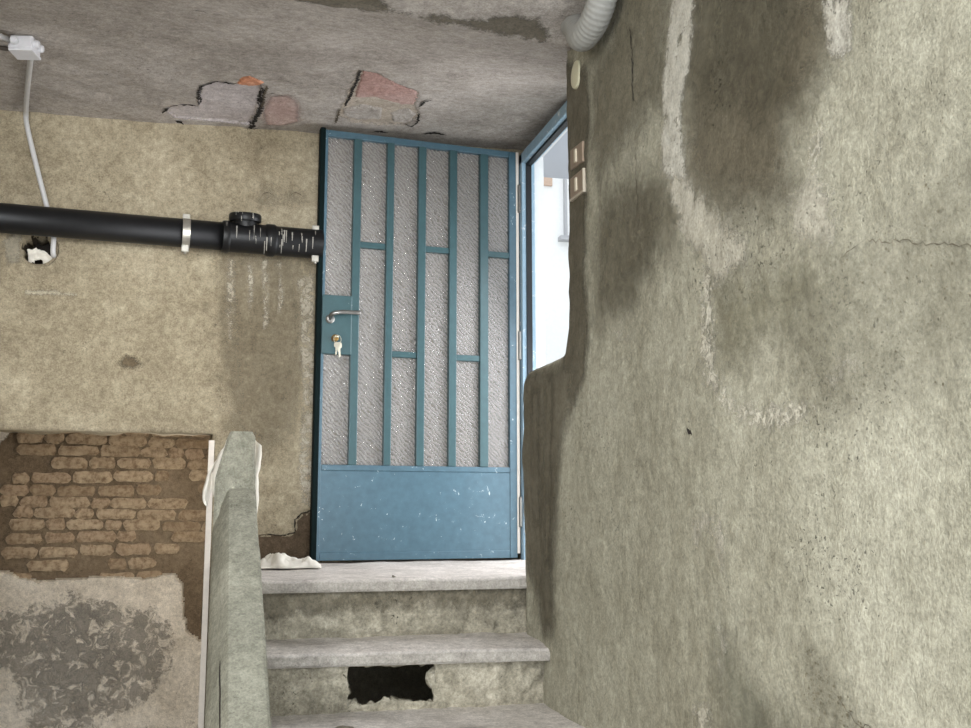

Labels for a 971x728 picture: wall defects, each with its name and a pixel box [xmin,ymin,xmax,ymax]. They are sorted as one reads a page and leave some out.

spalling [162,76,299,129]
spalling [334,70,431,133]
water stain [226,258,314,506]
water stain [263,0,825,634]
crack [839,238,969,262]
water stain [0,591,174,728]